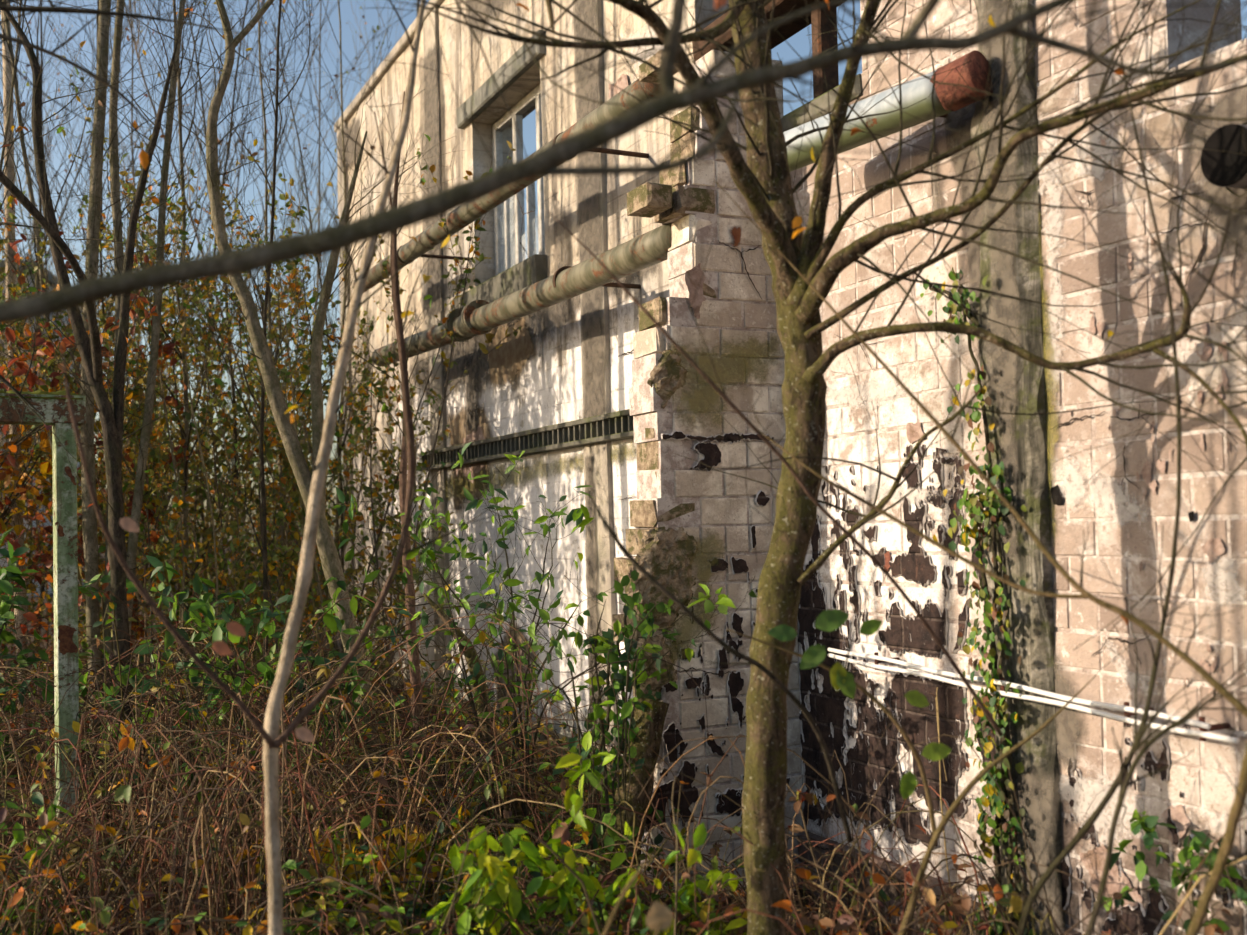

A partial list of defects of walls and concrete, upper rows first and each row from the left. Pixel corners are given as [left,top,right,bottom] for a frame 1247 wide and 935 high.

water stain [573,0,600,122]
water stain [554,152,601,269]
water stain [930,102,983,320]
water stain [410,265,655,446]
water stain [451,462,489,510]
peeling [661,430,774,472]
peeling [708,525,758,593]
peeling [786,422,996,848]
peeling [644,612,755,834]
peeling [1061,757,1169,935]
peeling [1122,722,1195,864]
peeling [1215,868,1247,908]